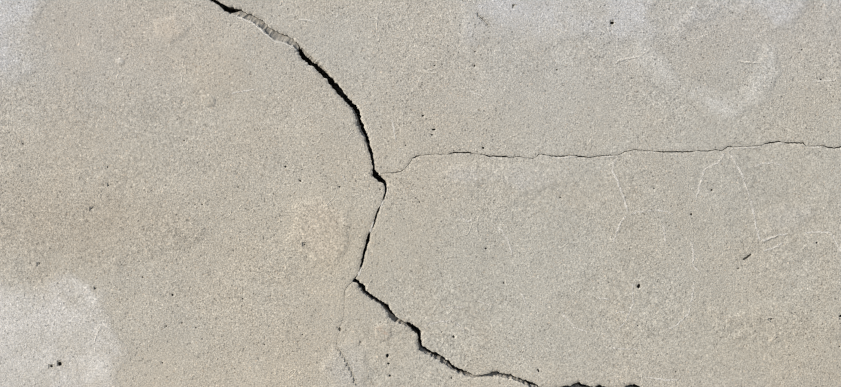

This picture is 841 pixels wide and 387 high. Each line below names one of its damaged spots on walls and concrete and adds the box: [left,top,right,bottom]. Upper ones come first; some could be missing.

crack [209,0,841,387]